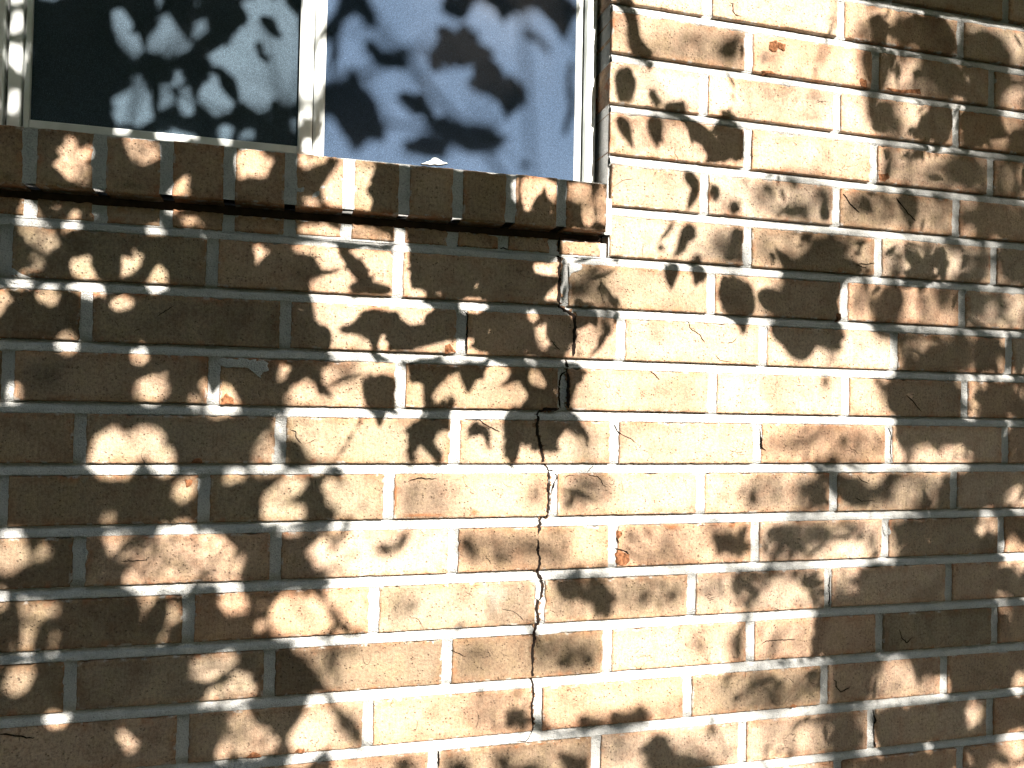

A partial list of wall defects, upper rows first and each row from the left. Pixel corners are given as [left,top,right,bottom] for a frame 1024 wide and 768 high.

crack [503,230,612,742]